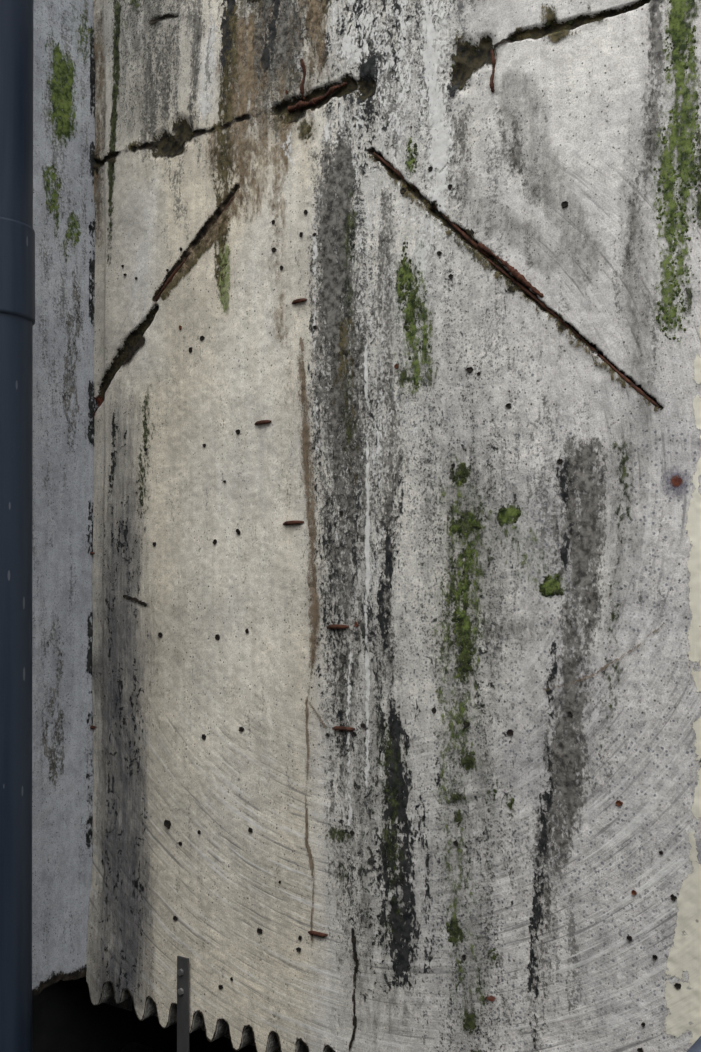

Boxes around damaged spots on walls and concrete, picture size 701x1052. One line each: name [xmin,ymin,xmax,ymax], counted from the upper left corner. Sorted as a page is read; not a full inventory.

water stain [59,0,177,451]
crack [94,109,273,173]
water stain [496,108,546,211]
crack [493,0,651,50]
water stain [619,0,667,272]
water stain [32,391,154,1003]
water stain [187,0,481,995]
water stain [527,436,632,1051]
peeling [685,457,701,692]
peeling [692,353,701,439]
peeling [664,718,701,1052]